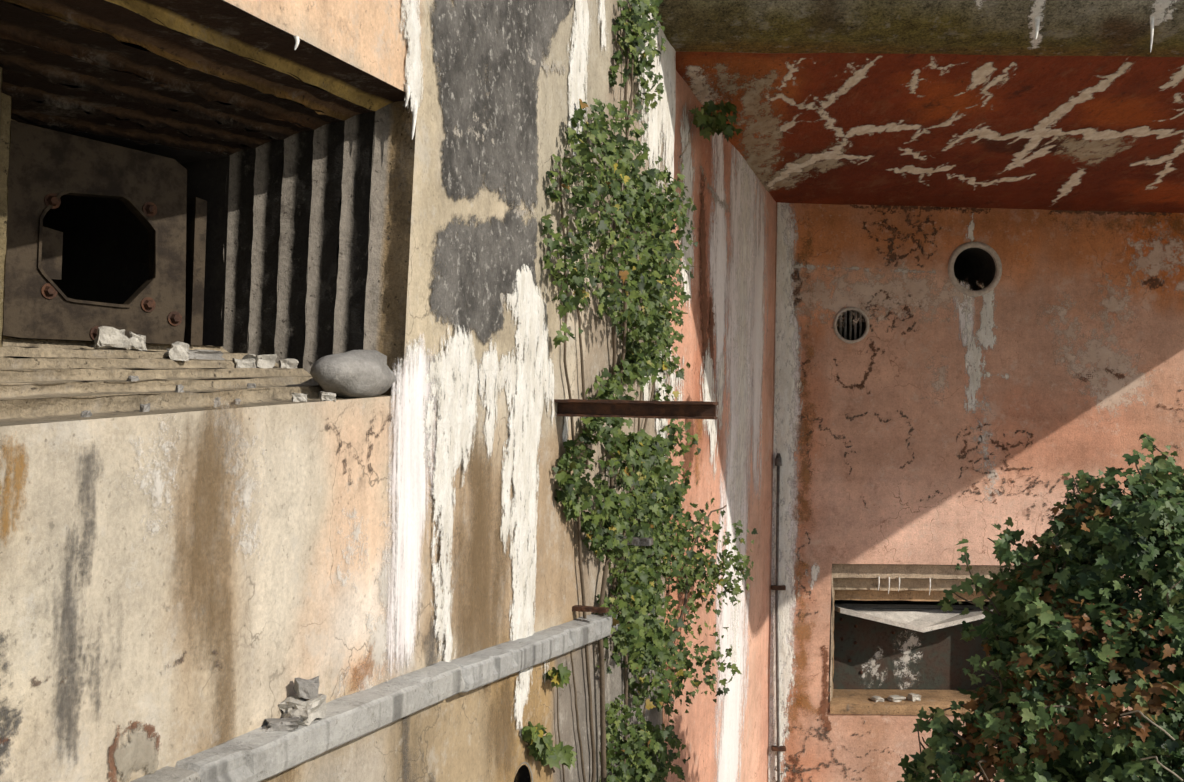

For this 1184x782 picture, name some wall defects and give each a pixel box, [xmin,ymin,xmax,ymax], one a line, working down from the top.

water stain [1028,0,1046,50]
water stain [1149,0,1179,26]
crack [790,270,803,315]
crack [799,210,942,475]
corrosion [0,439,27,539]
water stain [136,422,179,507]
water stain [337,264,569,692]
water stain [637,13,1009,782]
crack [920,424,1078,547]
crack [1157,389,1184,451]
water stain [56,452,95,749]
crack [774,719,904,782]